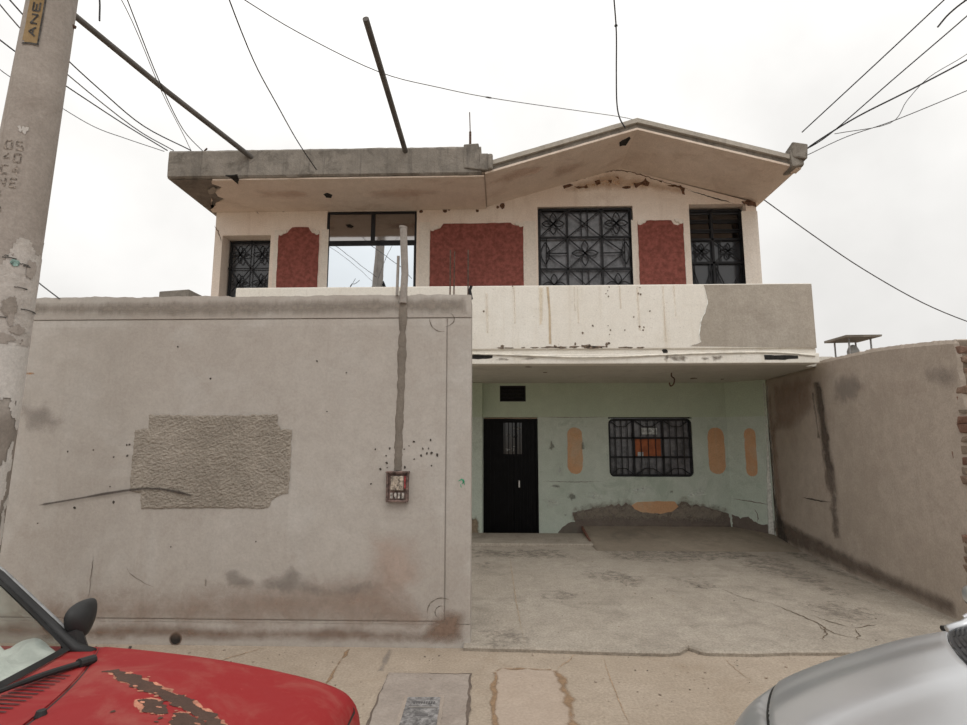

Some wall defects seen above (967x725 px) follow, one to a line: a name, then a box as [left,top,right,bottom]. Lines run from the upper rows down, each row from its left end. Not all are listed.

peeling [0,296,26,344]
peeling [692,284,817,348]
leakage [771,383,952,610]
crack [730,592,876,641]